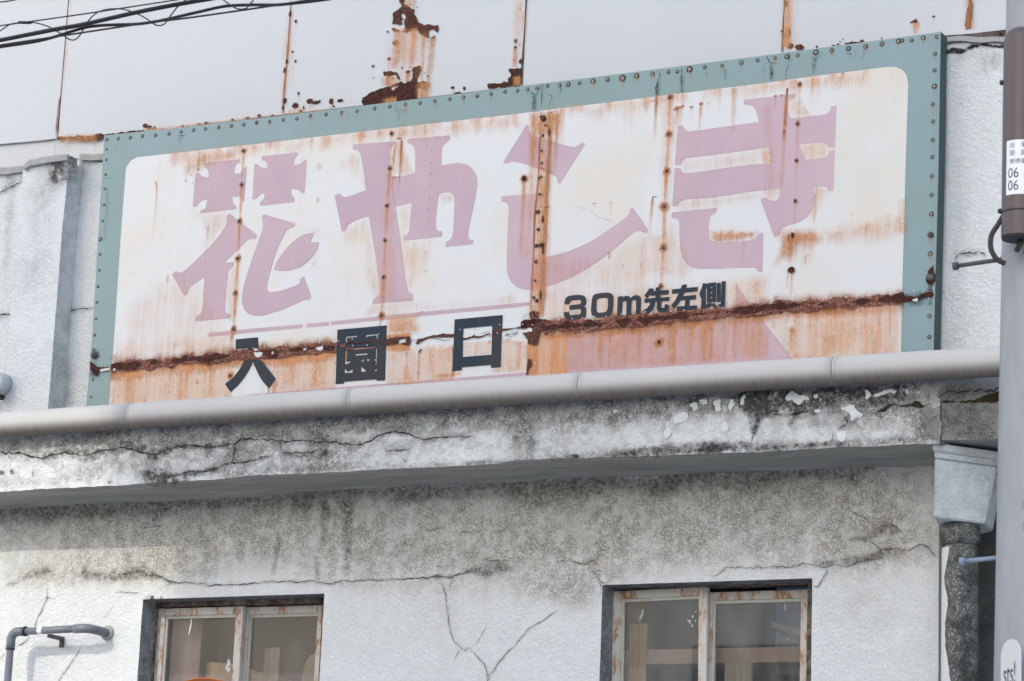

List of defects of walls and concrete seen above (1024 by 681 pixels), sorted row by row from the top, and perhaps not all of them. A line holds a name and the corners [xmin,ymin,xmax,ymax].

corrosion [361,0,439,108]
corrosion [487,0,527,89]
corrosion [111,290,337,403]
peeling [664,394,746,439]
peeling [775,390,821,413]
damp [735,384,907,434]
peeling [835,404,863,442]
crack [0,431,470,477]
damp [606,440,842,458]
damp [390,467,872,501]
crack [715,509,938,587]
crack [103,559,552,680]